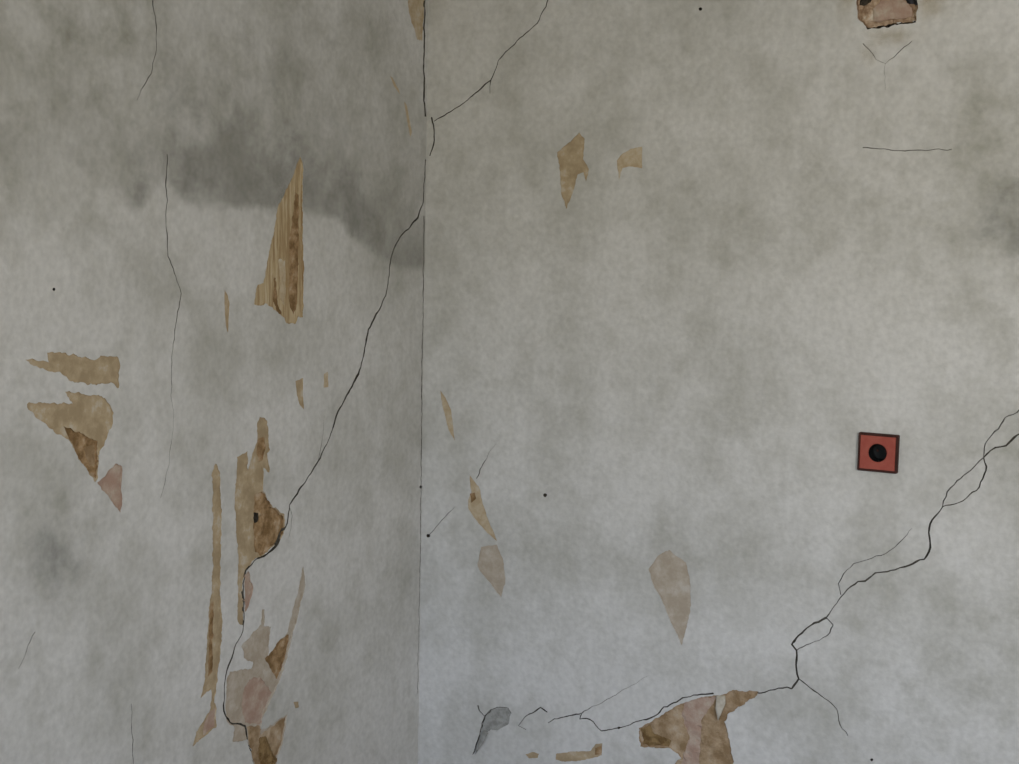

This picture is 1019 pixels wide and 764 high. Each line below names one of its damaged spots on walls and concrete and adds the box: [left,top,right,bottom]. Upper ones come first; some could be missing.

peeling [254,157,304,324]
peeling [557,133,589,209]
crack [863,145,952,153]
peeling [27,352,123,511]
crack [223,0,548,751]
peeling [193,464,305,764]
peeling [234,417,285,625]
peeling [468,476,505,596]
peeling [649,550,691,645]
crack [758,410,1019,736]
crack [518,676,714,731]
spalling [639,690,758,764]